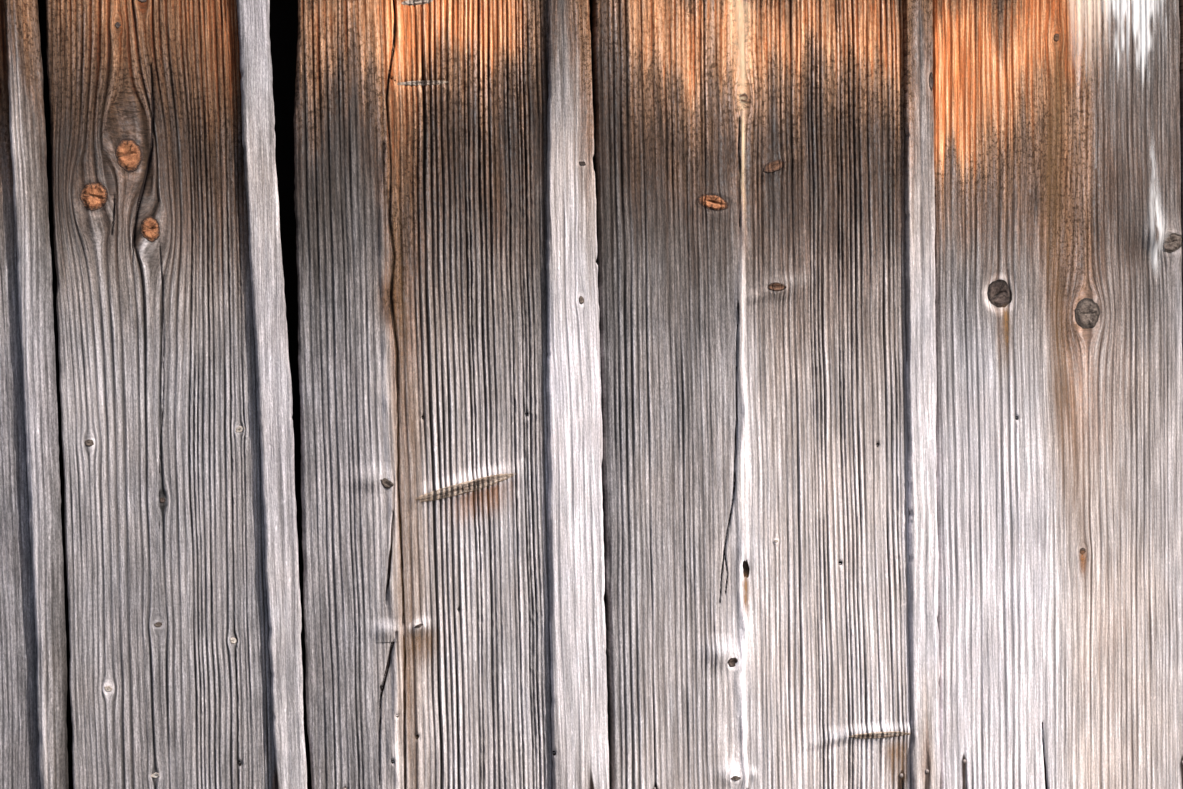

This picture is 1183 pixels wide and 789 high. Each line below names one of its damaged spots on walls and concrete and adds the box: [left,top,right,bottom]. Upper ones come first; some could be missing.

crack [378,0,406,789]
crack [720,303,739,603]